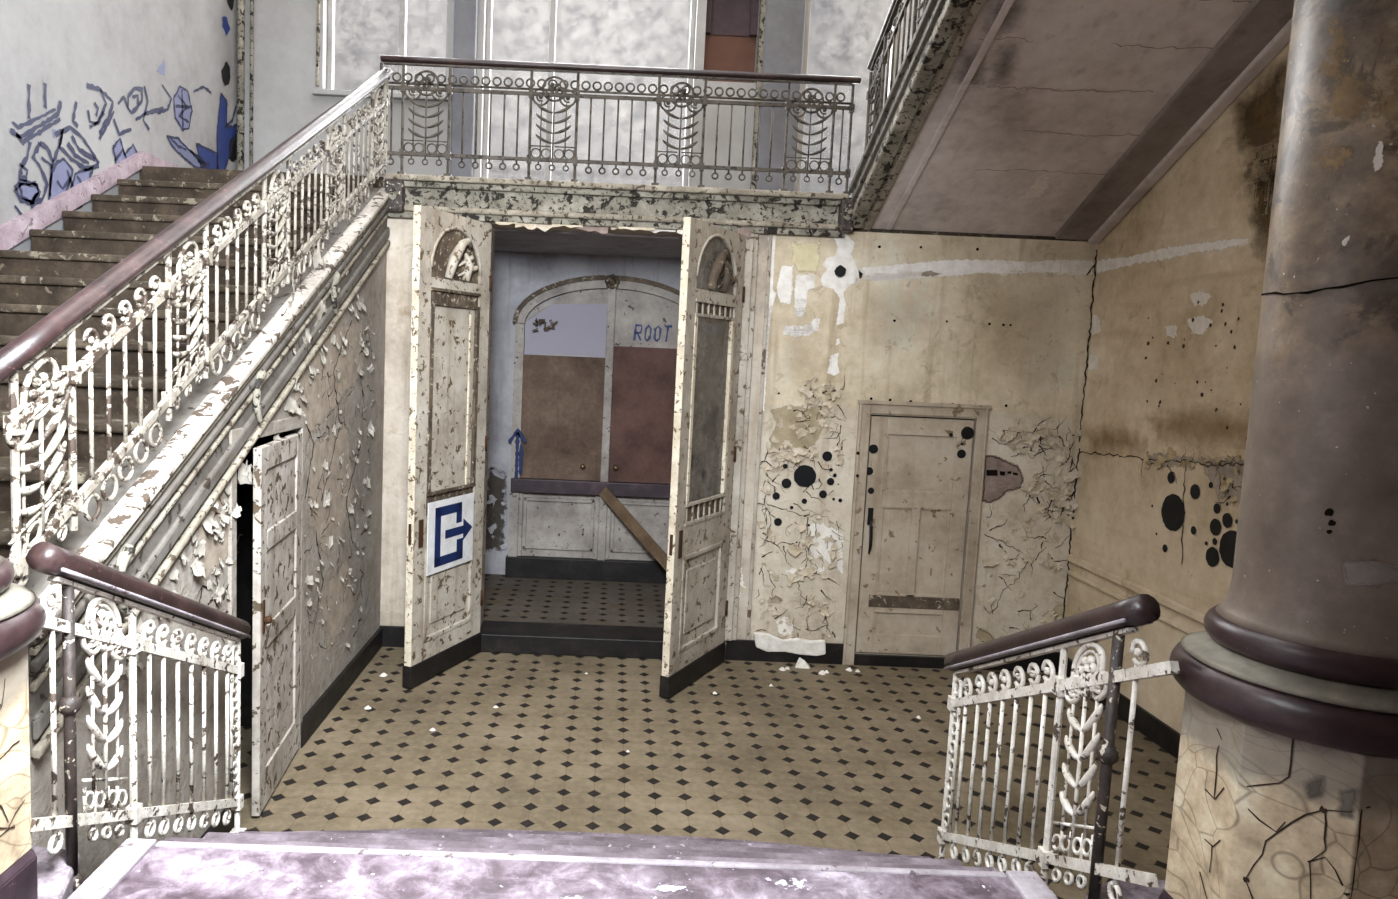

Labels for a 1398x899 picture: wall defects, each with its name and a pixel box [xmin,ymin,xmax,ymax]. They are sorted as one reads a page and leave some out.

damp [1236,66,1286,248]
crack [1261,277,1398,296]
flaking render [170,461,253,613]
flaking render [281,247,377,661]
flaking render [735,375,846,642]
flaking render [973,417,1082,646]
peeling [121,653,146,678]
crack [0,800,25,837]
crack [1199,839,1221,899]
crack [1205,729,1371,899]